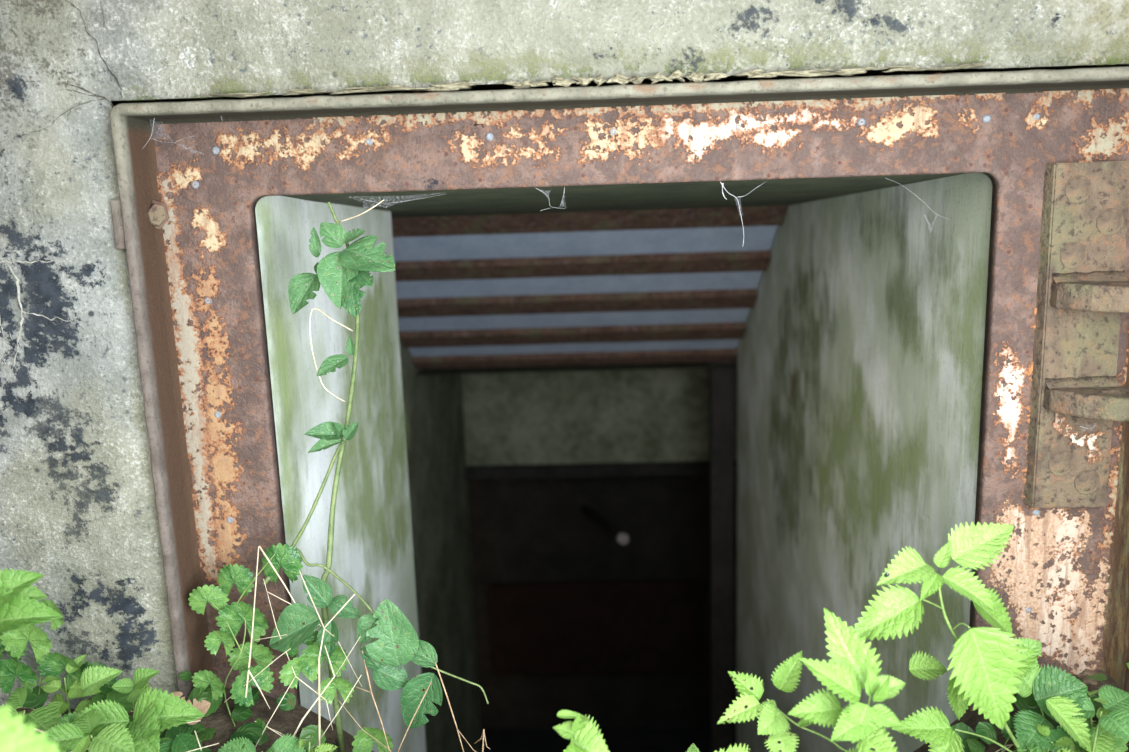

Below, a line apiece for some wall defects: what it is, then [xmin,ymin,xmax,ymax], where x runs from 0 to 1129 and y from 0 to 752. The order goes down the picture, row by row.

crack [0,0,122,153]
water stain [771,272,923,549]
water stain [888,218,916,341]
water stain [948,264,983,456]
corrosion [1017,345,1040,513]
water stain [875,570,962,693]